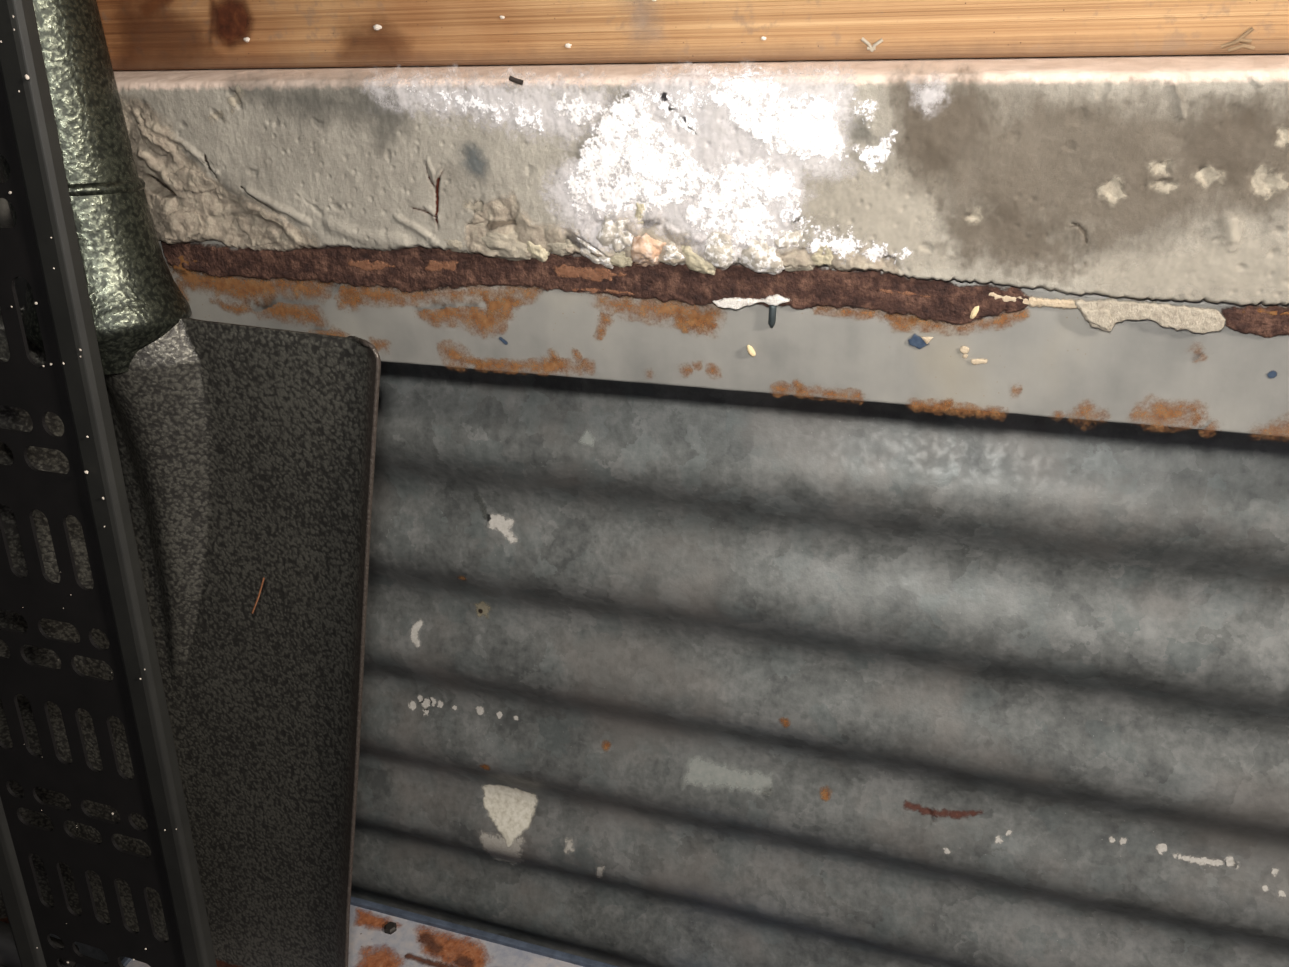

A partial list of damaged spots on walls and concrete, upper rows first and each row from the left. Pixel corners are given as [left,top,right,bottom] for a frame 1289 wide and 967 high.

spalling [120,98,321,252]
leakage [353,67,1289,272]
spalling [465,195,708,265]
rust [161,241,1029,340]
spalling [775,244,898,275]
spalling [966,209,982,223]
peeling [989,292,1226,334]
leakage [1099,235,1289,299]
rust [1221,305,1289,338]
rust [904,801,982,819]